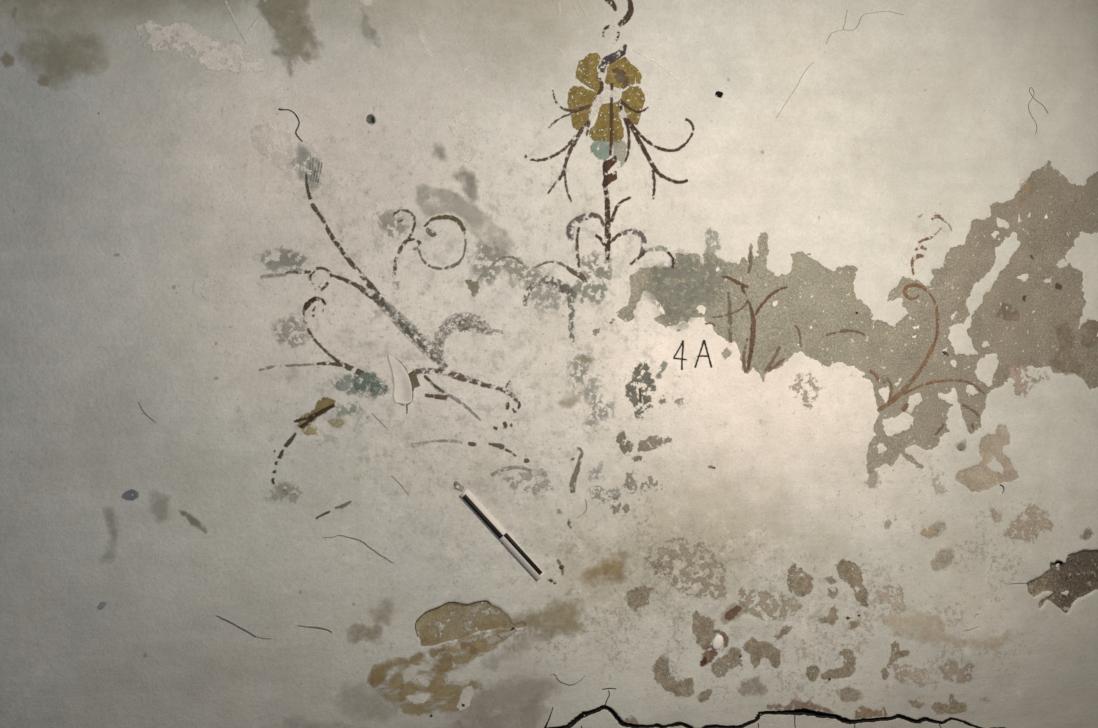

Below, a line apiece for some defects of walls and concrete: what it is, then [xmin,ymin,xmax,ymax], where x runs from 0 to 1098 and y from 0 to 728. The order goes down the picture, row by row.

damp [258,0,317,72]
flaking render [593,160,1098,493]
peeling [612,431,672,514]
peeling [627,538,726,611]
peeling [653,657,712,702]
peeling [692,611,716,649]
peeling [712,564,813,695]
crack [544,674,1005,728]
peeling [802,648,860,700]
peeling [820,559,906,629]
peeling [881,641,929,685]
flaking render [1027,530,1098,613]